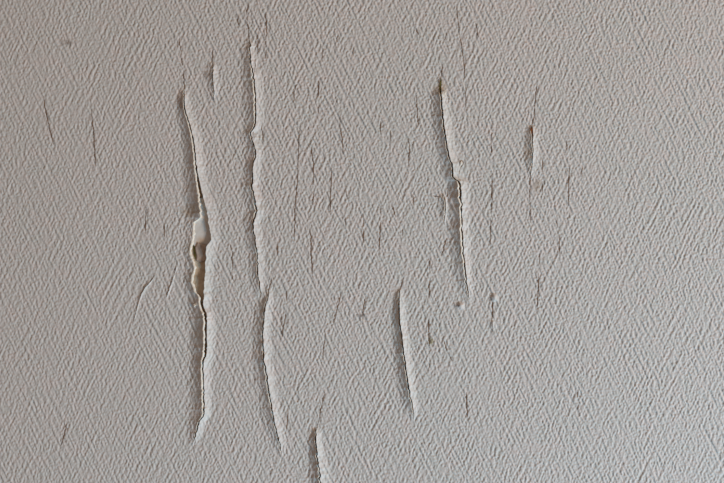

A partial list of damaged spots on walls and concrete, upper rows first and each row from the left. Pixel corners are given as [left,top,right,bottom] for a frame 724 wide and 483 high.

flaking render [193,198,211,262]
crack [429,160,464,294]